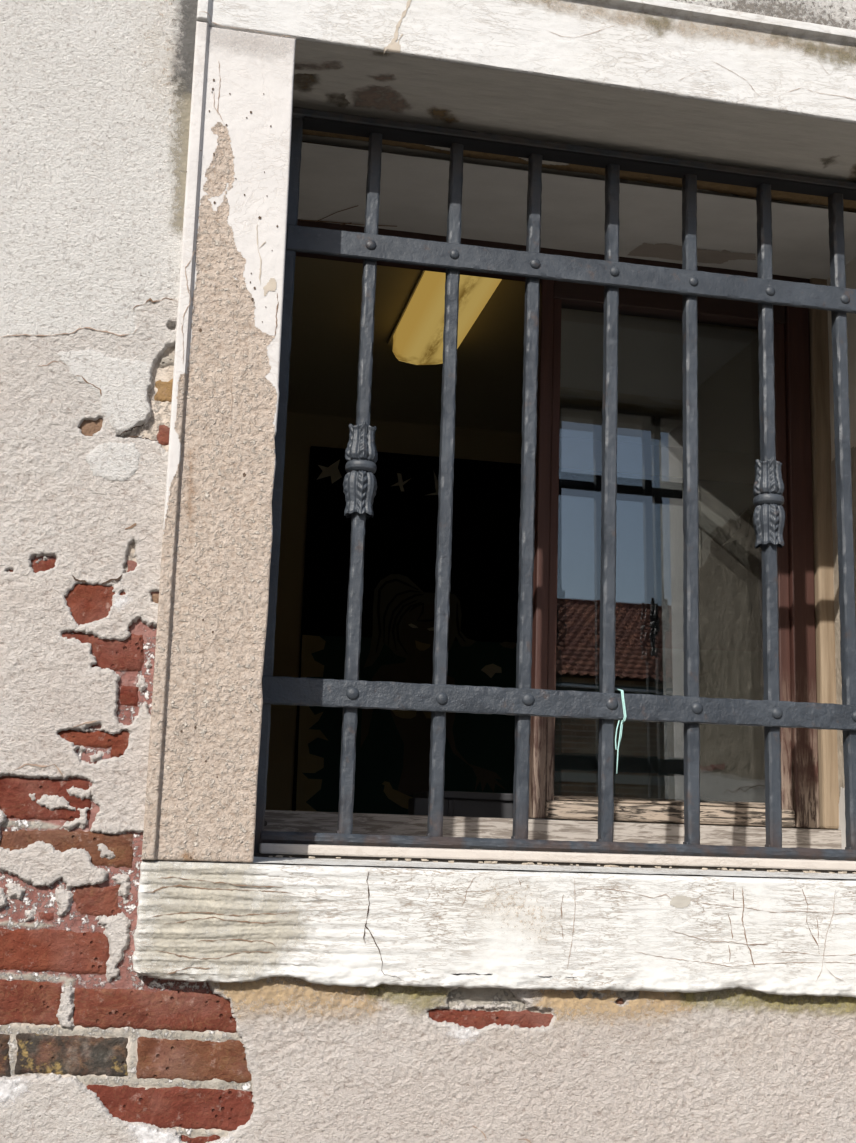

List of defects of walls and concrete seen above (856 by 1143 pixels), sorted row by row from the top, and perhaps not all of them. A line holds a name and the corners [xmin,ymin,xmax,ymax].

crack [384,0,412,53]
peeling [0,110,277,1143]
crack [363,872,400,979]
crack [728,889,765,967]
crack [802,889,843,981]
spalling [427,987,554,1029]